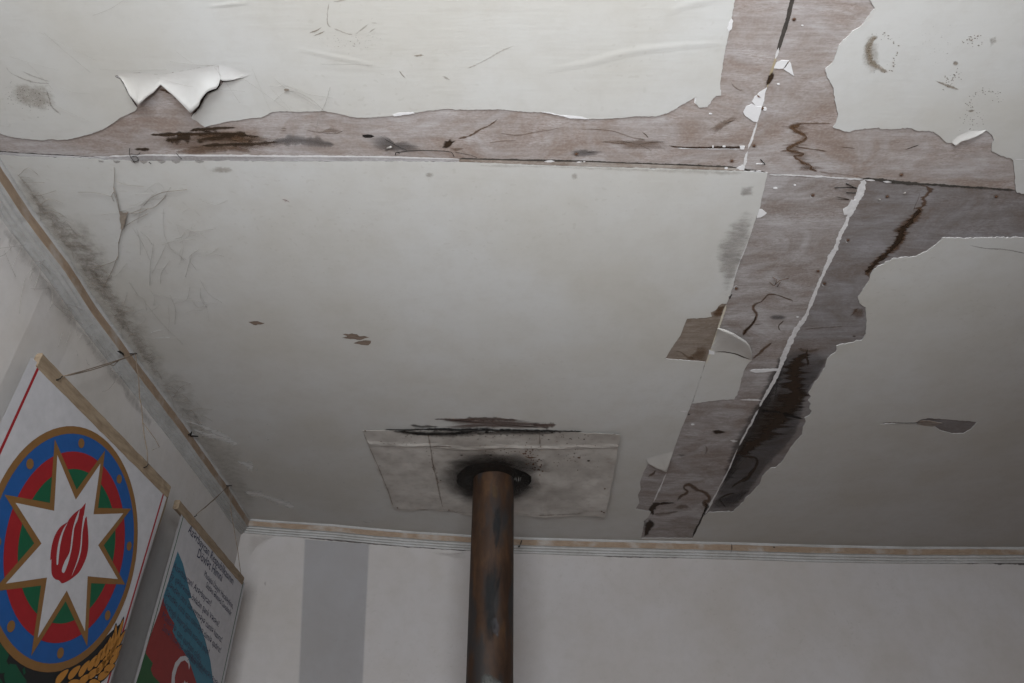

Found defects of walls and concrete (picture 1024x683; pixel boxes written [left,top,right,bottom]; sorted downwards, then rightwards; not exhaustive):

water stain [151,127,275,147]
peeling [0,0,1024,538]
water stain [412,417,516,427]
water stain [645,351,810,536]